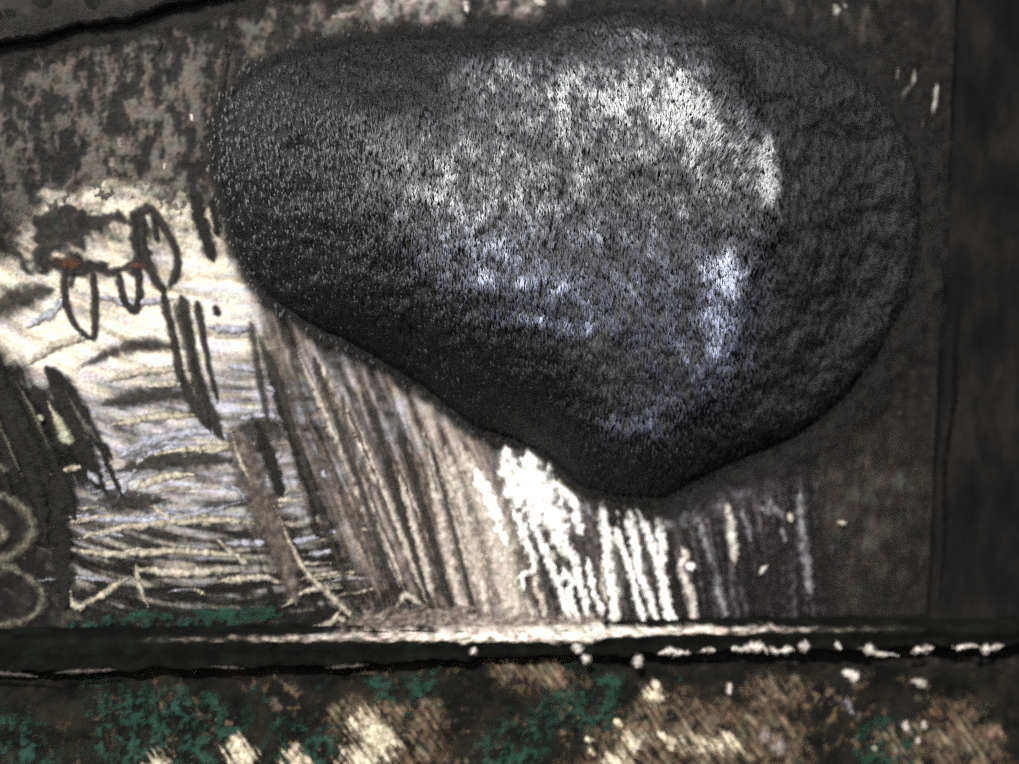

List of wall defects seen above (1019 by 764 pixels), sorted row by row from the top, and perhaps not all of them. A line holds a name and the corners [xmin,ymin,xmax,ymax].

crack [0,0,311,134]